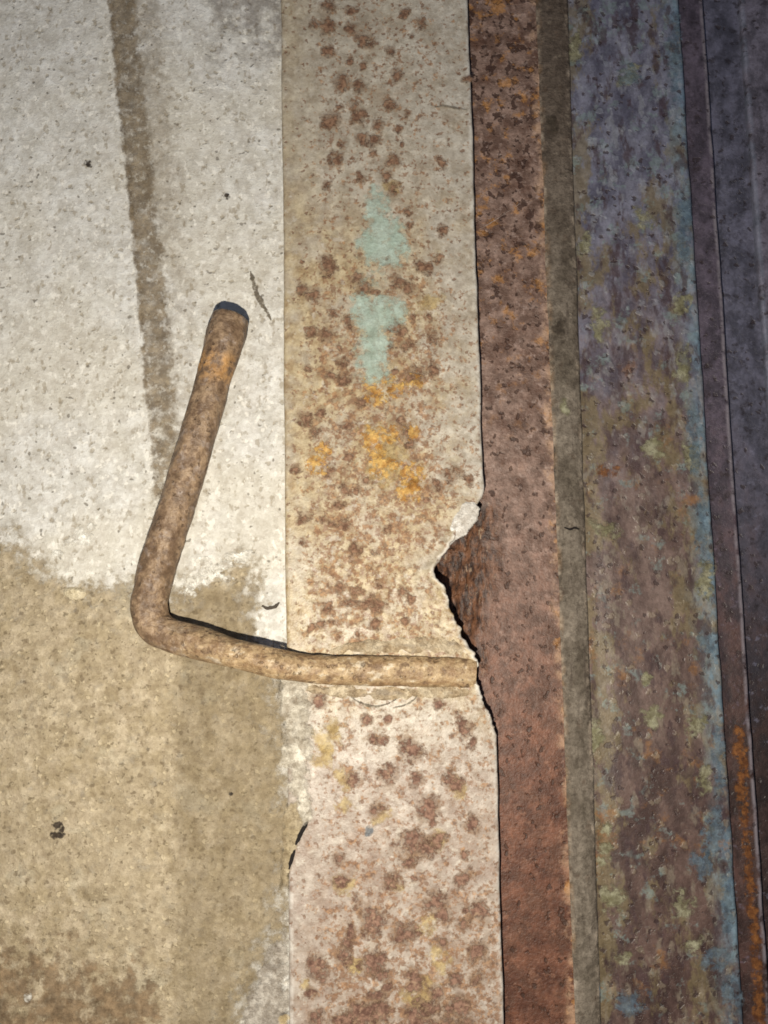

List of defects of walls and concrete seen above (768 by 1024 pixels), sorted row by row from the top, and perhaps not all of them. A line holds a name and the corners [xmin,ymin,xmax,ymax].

water stain [0,523,289,1024]
corrosion [289,0,576,1024]
peeling [450,502,480,545]
corrosion [732,726,765,1024]